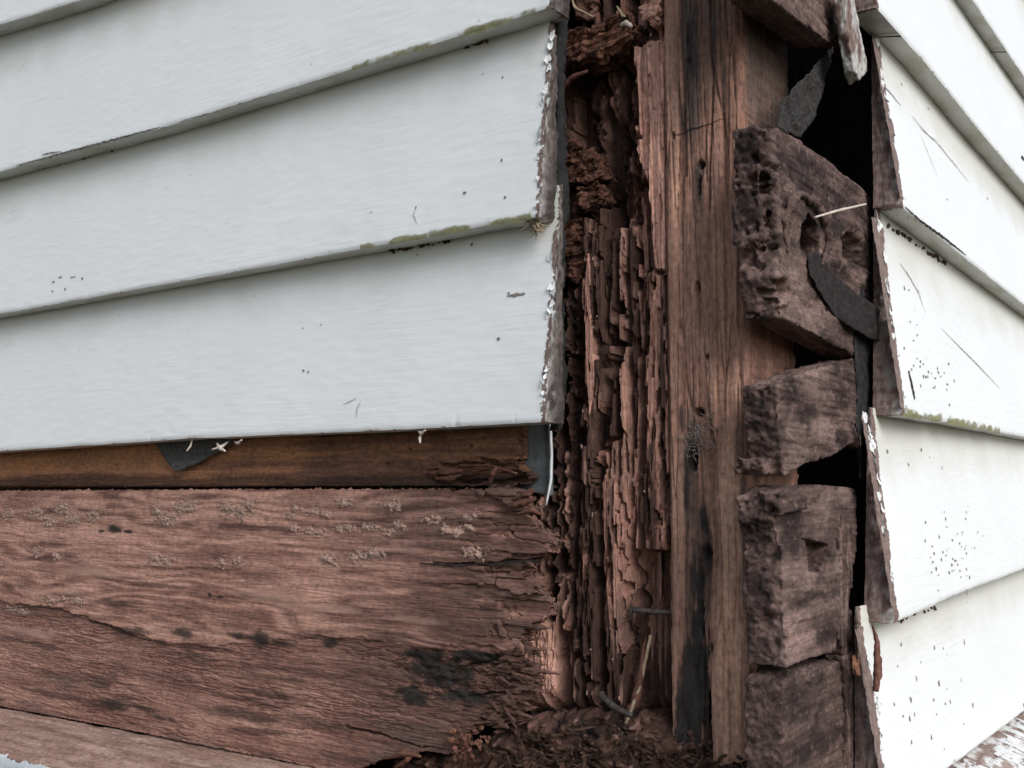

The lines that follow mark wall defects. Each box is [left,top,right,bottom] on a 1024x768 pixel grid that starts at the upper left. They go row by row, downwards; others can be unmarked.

peeling [861,412,896,607]
crack [7,606,151,642]
leakage [397,649,500,706]
leakage [674,507,713,768]
peeling [855,626,895,768]
peeling [952,718,1024,768]